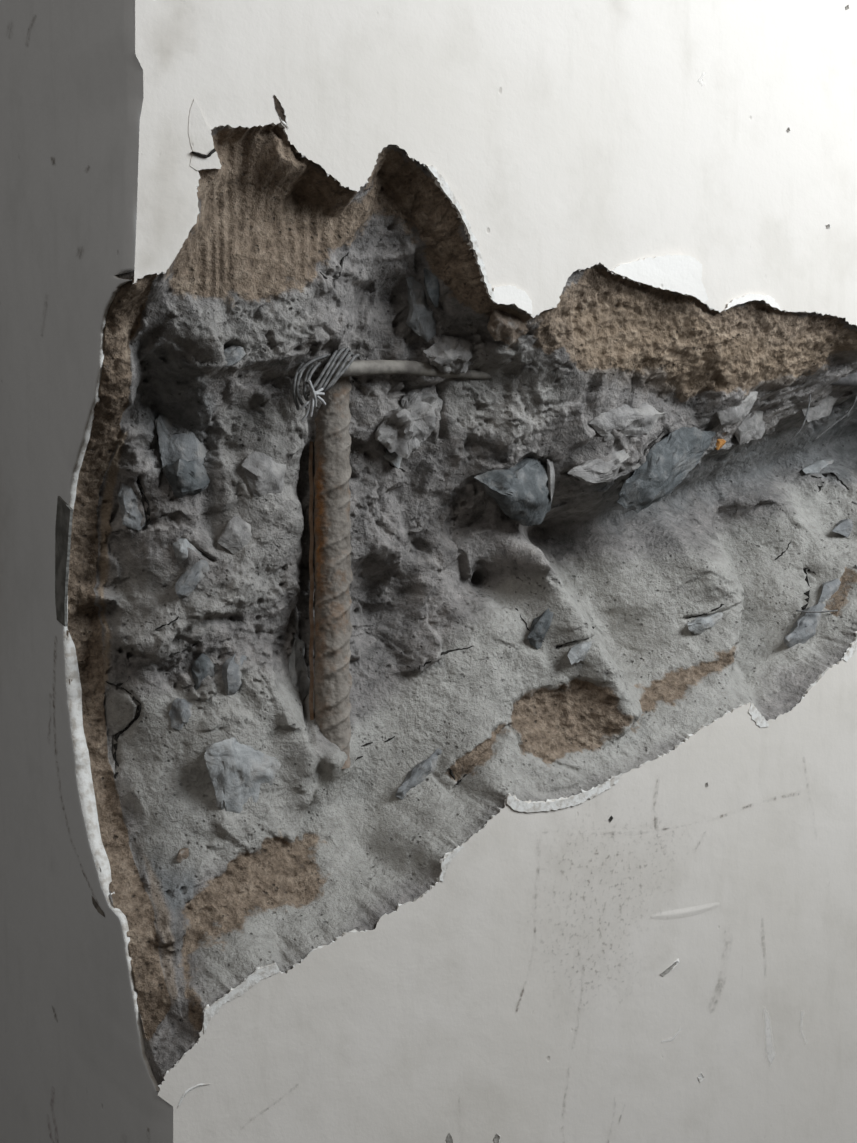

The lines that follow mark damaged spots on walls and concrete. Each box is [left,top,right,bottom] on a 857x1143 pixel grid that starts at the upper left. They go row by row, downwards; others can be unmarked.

peeling [188,100,214,155]
peeling [274,95,289,129]
spalling [55,124,857,1085]